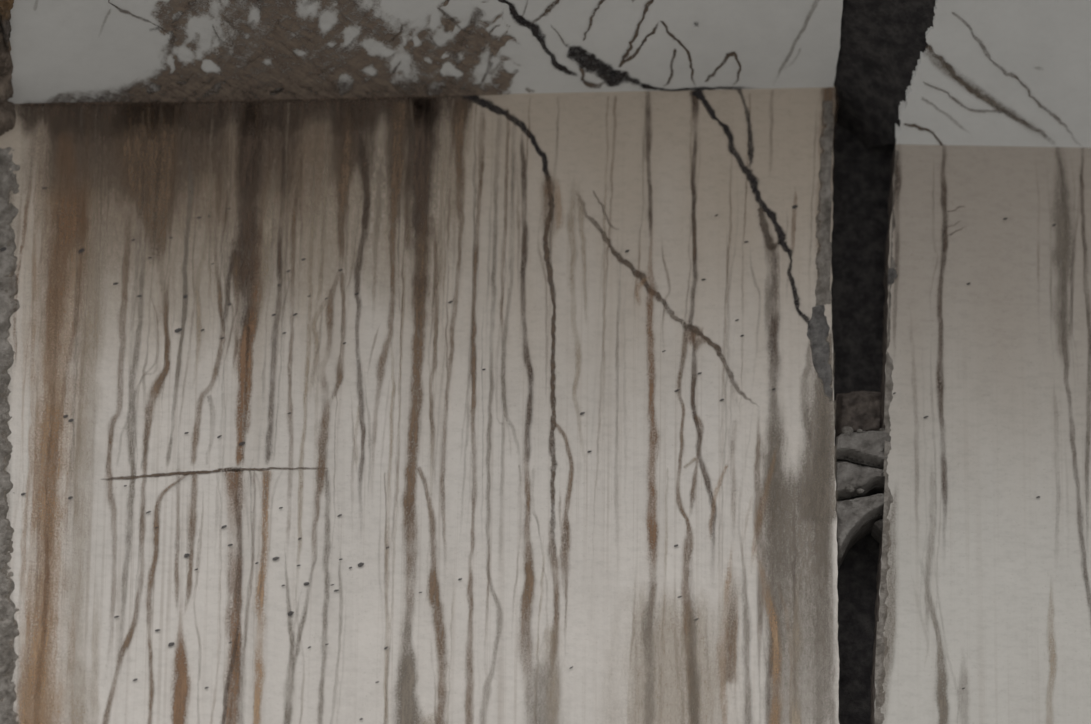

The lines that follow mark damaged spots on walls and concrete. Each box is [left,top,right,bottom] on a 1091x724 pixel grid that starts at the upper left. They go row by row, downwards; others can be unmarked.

spalling [0,0,26,724]
corrosion [19,404,62,724]
crack [106,467,316,480]
damp [16,0,516,724]
crack [463,95,574,661]
damp [521,471,535,651]
crack [489,0,810,362]
damp [641,283,658,561]
damp [677,315,716,587]
corrosion [725,603,737,679]
spalling [807,100,835,401]
spalling [875,147,899,724]